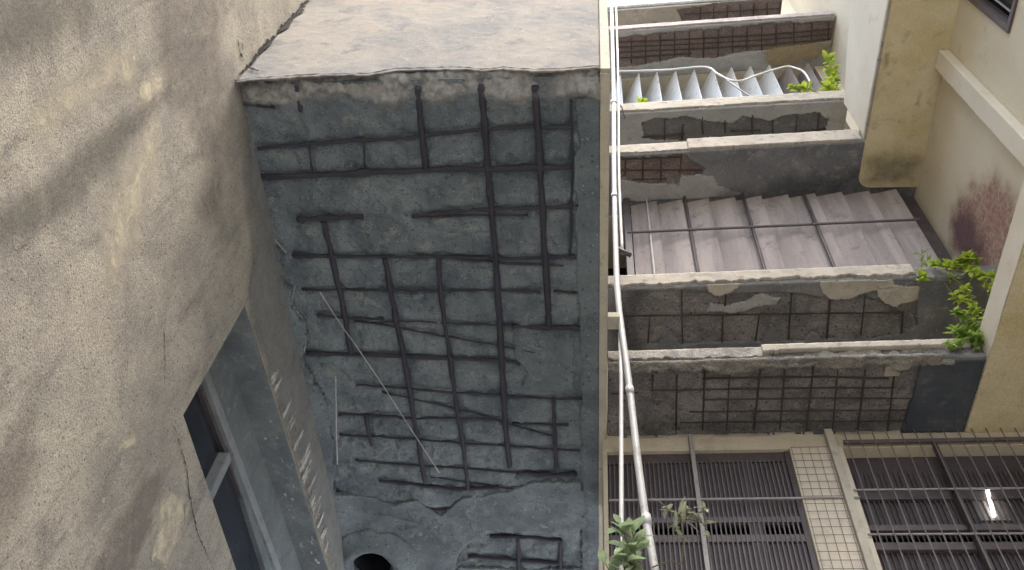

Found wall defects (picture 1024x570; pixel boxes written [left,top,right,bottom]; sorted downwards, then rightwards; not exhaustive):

spalling [614,0,834,67]
spalling [616,112,828,184]
spalling [241,69,600,570]
spalling [608,279,956,436]
crack [169,415,214,570]